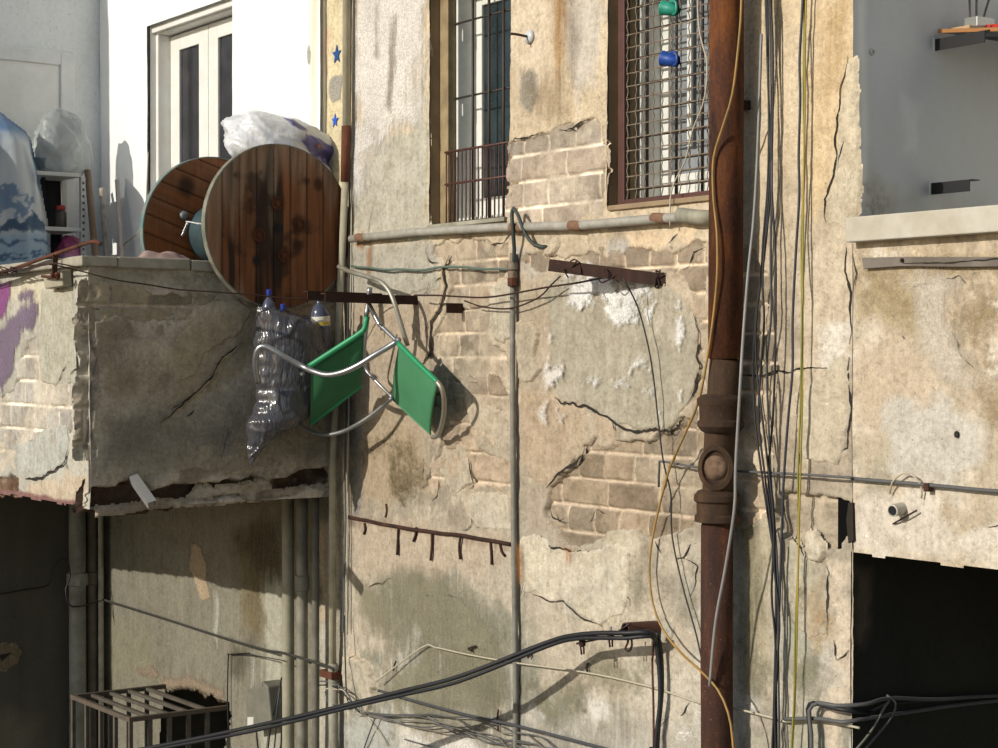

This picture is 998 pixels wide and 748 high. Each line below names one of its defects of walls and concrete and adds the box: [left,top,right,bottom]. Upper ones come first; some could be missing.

spalling [505,118,613,222]
crack [824,56,848,222]
peeling [0,278,336,518]
crack [160,341,242,424]
crack [422,249,450,364]
spalling [348,236,708,626]
crack [555,314,700,433]
spalling [734,246,780,531]
peeling [779,491,838,639]
water stain [359,572,505,721]
water stain [399,733,482,748]
water stain [520,683,700,748]